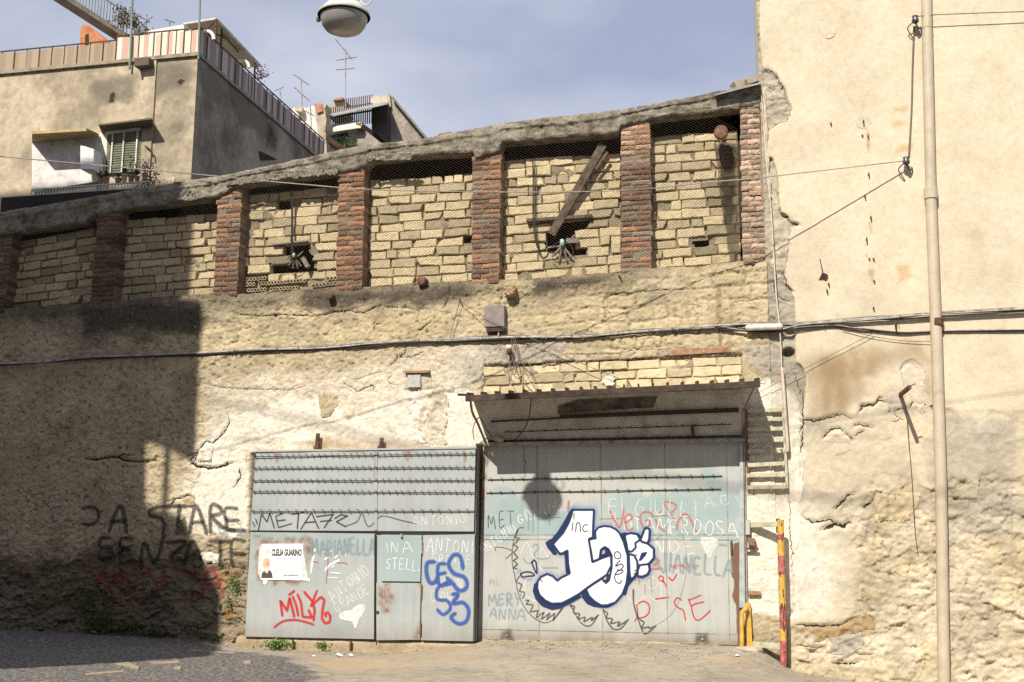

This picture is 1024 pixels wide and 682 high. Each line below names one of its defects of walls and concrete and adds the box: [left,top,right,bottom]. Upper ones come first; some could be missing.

spalling [763,71,793,128]
spalling [768,157,789,279]
spalling [318,392,338,417]
peeling [887,360,932,414]
crack [86,453,155,463]
crack [188,416,241,487]
spalling [868,492,920,551]